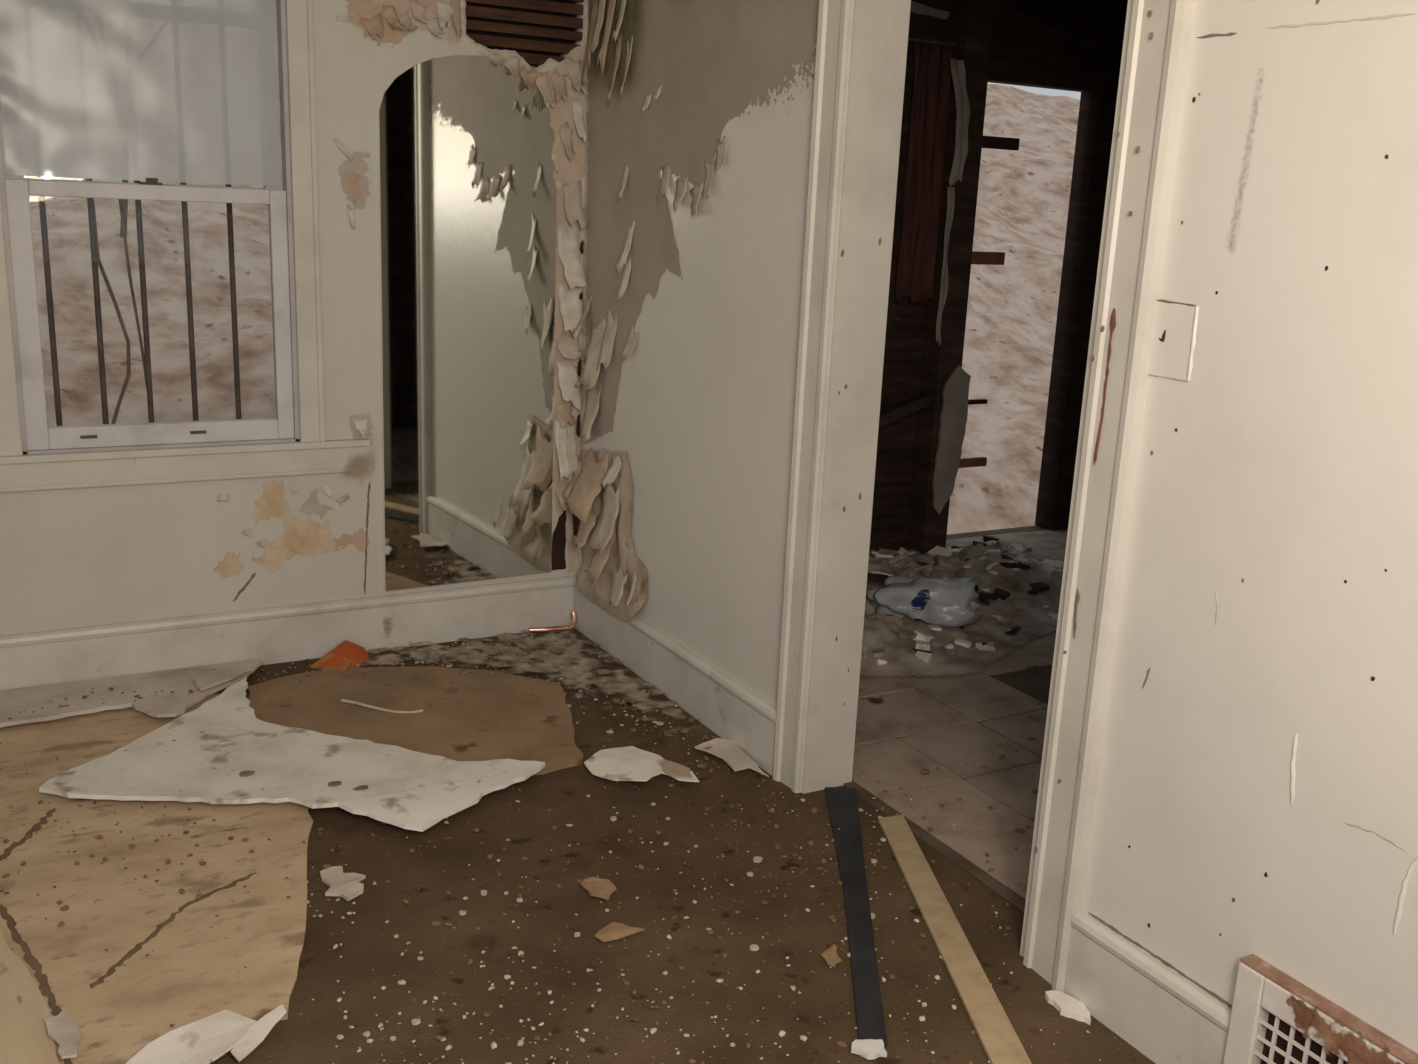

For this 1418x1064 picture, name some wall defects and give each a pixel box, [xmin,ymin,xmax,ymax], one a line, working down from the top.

peeling [332,0,819,575]
peeling [213,481,370,581]
crack [1342,821,1418,934]
corrosion [1286,996,1401,1064]